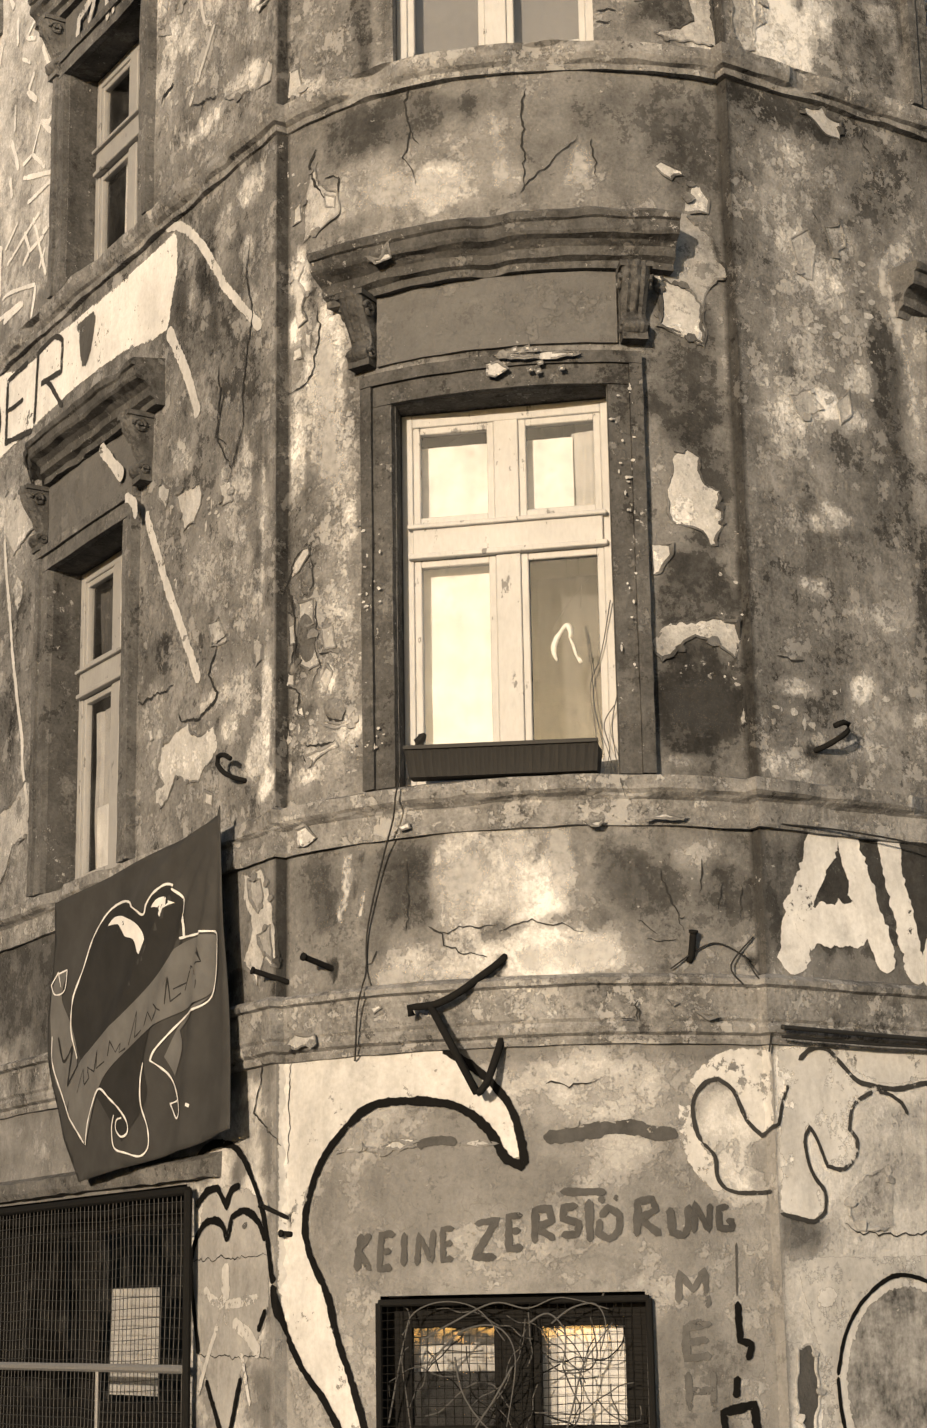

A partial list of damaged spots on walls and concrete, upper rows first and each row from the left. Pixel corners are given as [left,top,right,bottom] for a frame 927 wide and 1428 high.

flaking render [653,0,769,52]
crack [402,90,419,184]
crack [520,89,597,192]
flaking render [651,160,727,349]
water stain [878,243,911,380]
water stain [911,397,921,429]
flaking render [666,445,726,547]
flaking render [292,547,311,578]
flaking render [626,541,674,618]
flaking render [286,598,337,692]
flaking render [652,613,747,725]
flaking render [148,722,218,809]